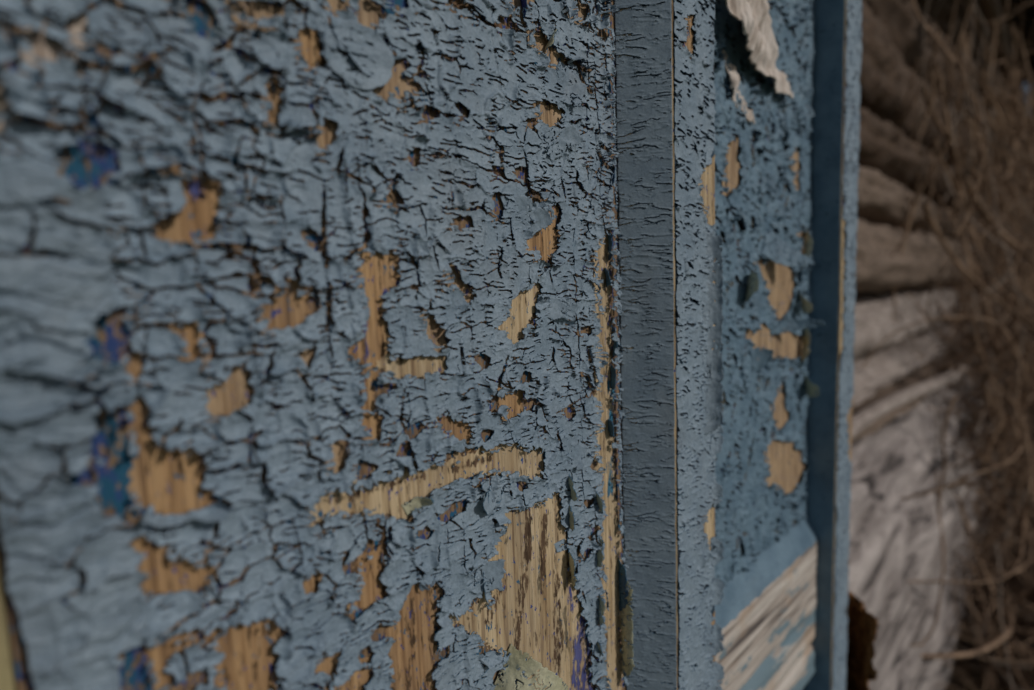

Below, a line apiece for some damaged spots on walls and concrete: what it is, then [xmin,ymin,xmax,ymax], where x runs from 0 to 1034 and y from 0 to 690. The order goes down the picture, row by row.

peeling [48,123,245,248]
crack [141,89,246,143]
crack [225,248,314,278]
peeling [172,0,423,113]
crack [347,152,374,249]
crack [449,0,536,38]
crack [431,101,562,199]
peeling [495,194,578,361]
crack [552,247,596,413]
peeling [690,126,745,606]
peeling [744,212,825,496]
peeling [61,223,635,690]